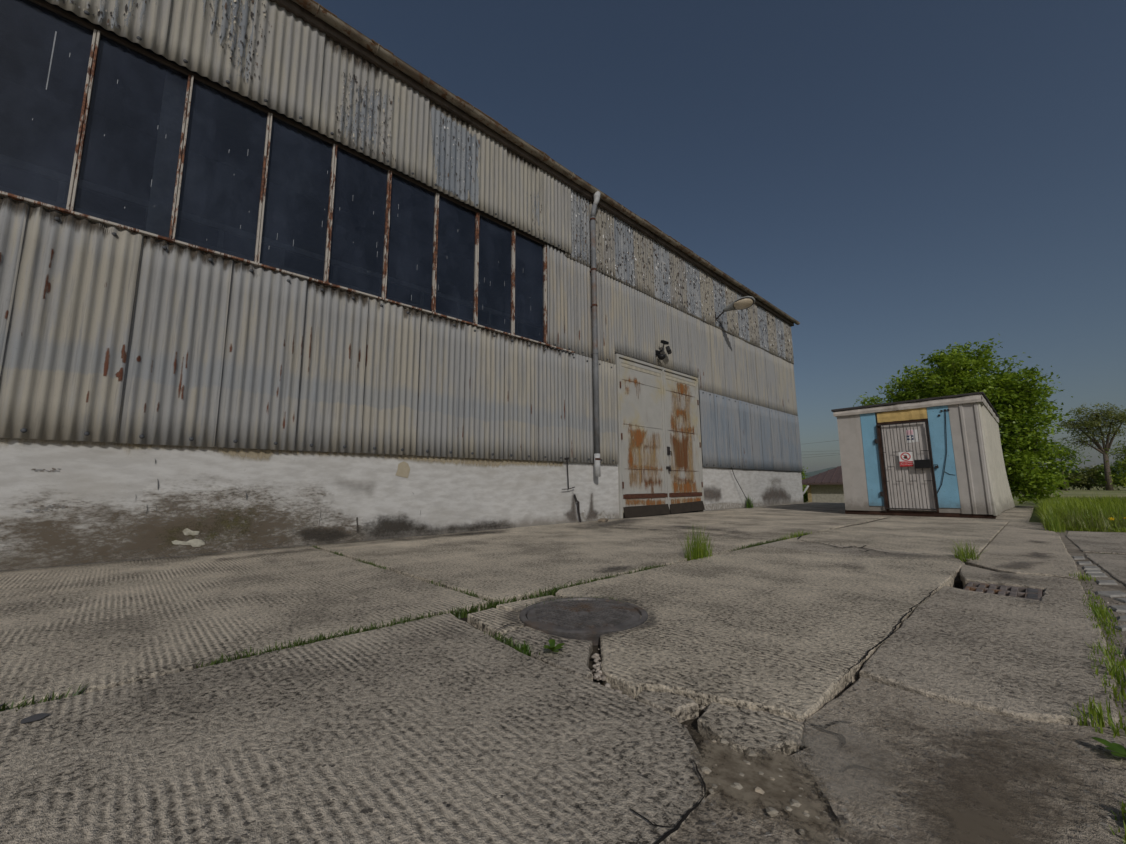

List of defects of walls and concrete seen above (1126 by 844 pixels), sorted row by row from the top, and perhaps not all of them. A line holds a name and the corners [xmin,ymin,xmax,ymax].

peeling [203,0,272,84]
peeling [335,72,399,162]
peeling [431,107,480,207]
rust [43,249,54,299]
peeling [571,189,794,361]
rust [103,345,153,381]
rust [625,383,701,506]
water stain [0,488,507,571]
crack [797,517,922,556]
spalling [687,731,856,844]